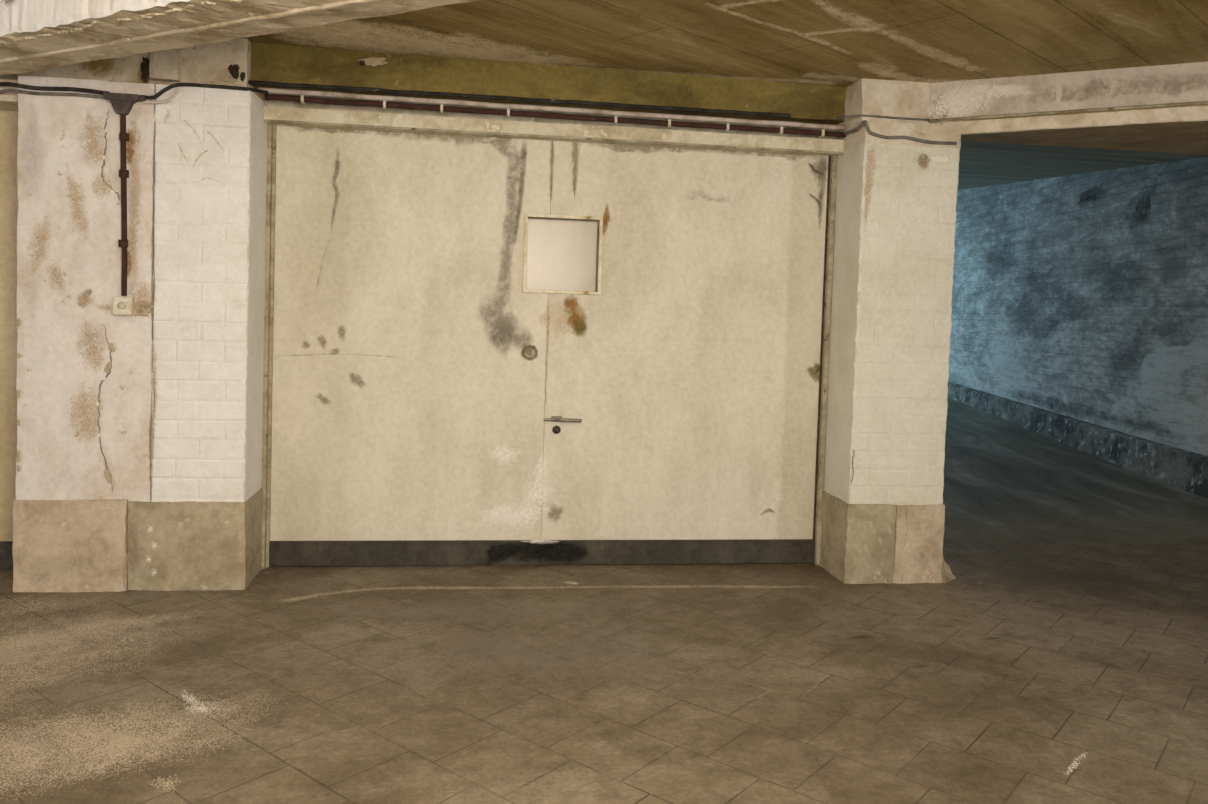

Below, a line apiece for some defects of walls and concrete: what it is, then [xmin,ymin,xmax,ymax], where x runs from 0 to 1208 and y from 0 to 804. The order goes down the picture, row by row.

damp [62,163,89,234]
damp [28,214,66,295]
damp [298,126,537,360]
corrosion [538,299,585,342]